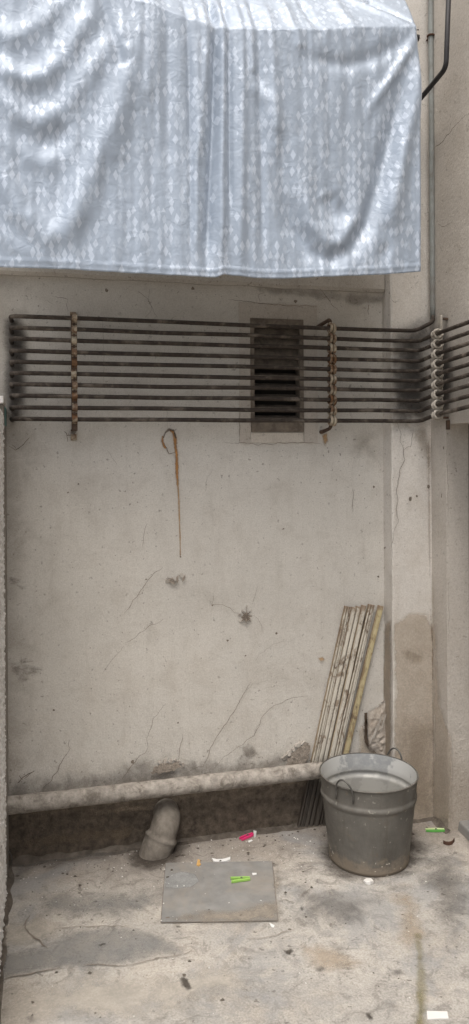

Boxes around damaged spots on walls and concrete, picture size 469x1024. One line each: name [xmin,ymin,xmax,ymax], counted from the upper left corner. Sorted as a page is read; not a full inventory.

corrosion [161,428,181,556]
crack [178,685,303,771]
peeling [282,740,311,765]
leakage [361,615,451,819]